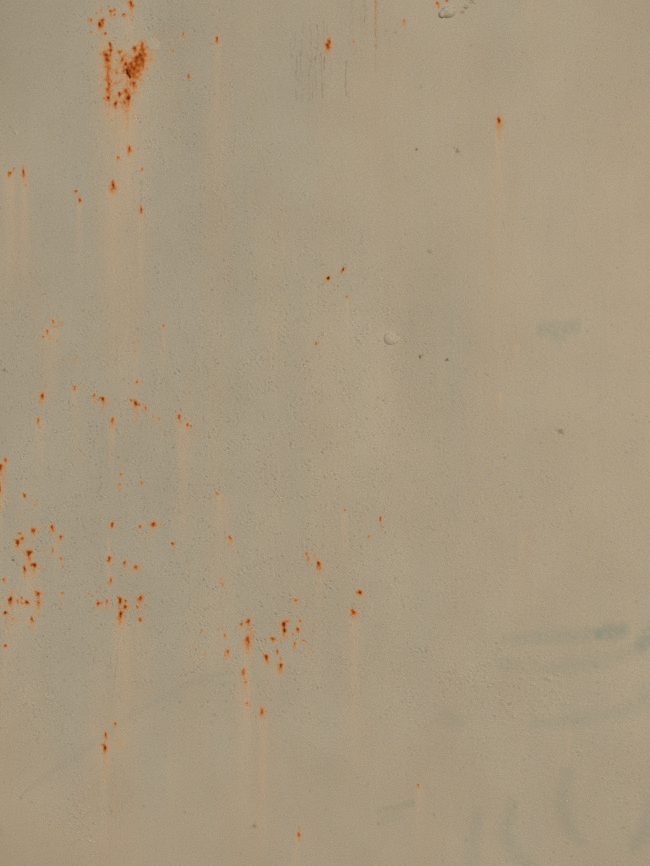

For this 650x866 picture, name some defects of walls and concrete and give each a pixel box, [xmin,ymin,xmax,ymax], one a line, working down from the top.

rust [66,0,194,250]
rust [0,489,48,651]
rust [85,516,142,626]
rust [199,550,328,706]